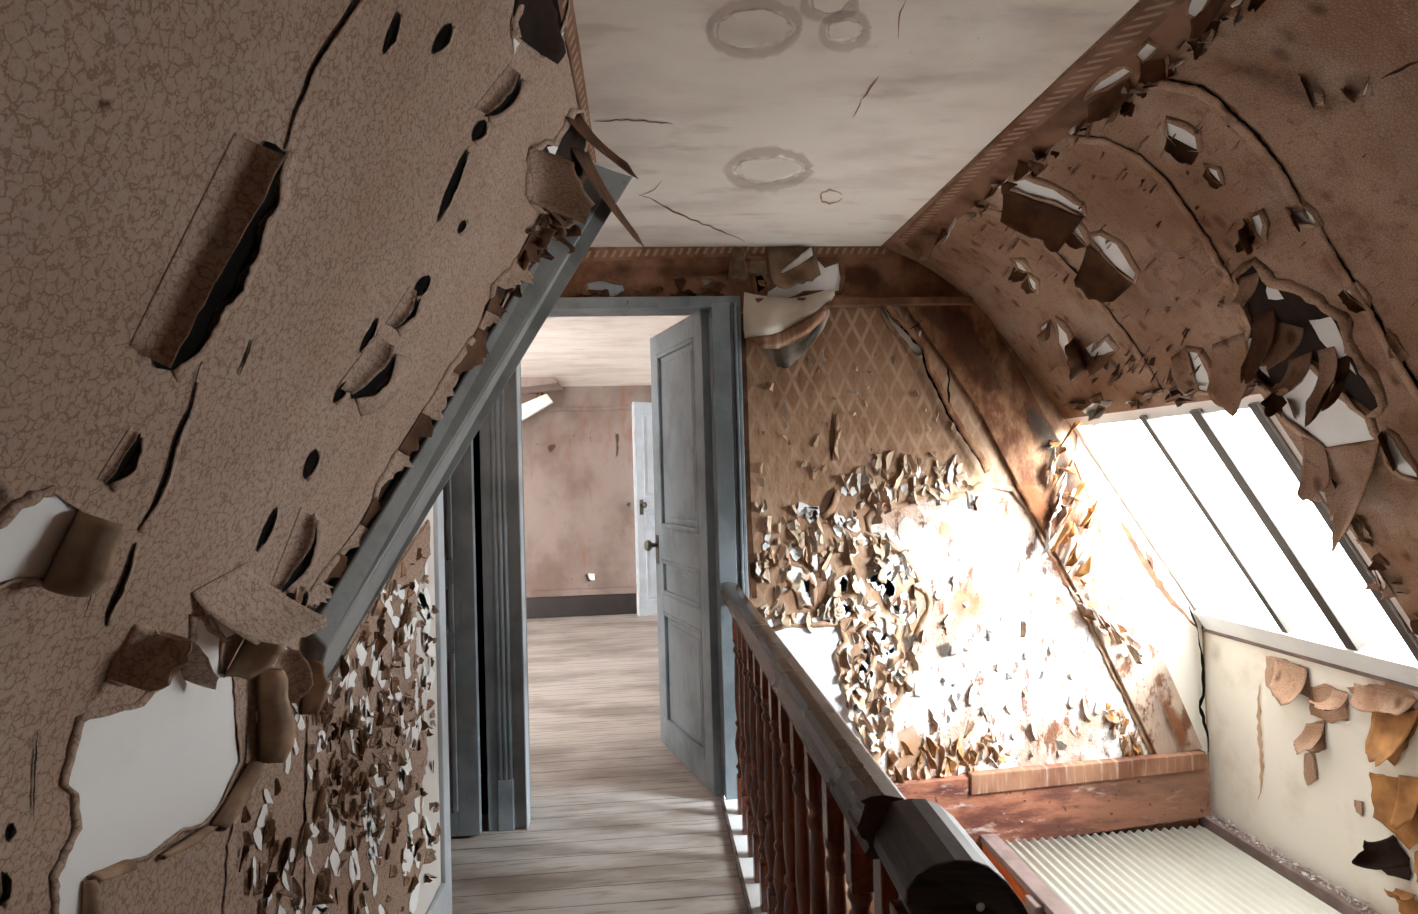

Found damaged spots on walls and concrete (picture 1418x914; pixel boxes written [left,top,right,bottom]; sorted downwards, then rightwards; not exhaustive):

leakage [718,9,792,48]
leakage [812,0,861,40]
peeling [935,0,1266,246]
leakage [735,158,802,183]
peeling [1091,329,1191,386]
flaking render [754,420,1155,783]
peeling [239,548,442,914]